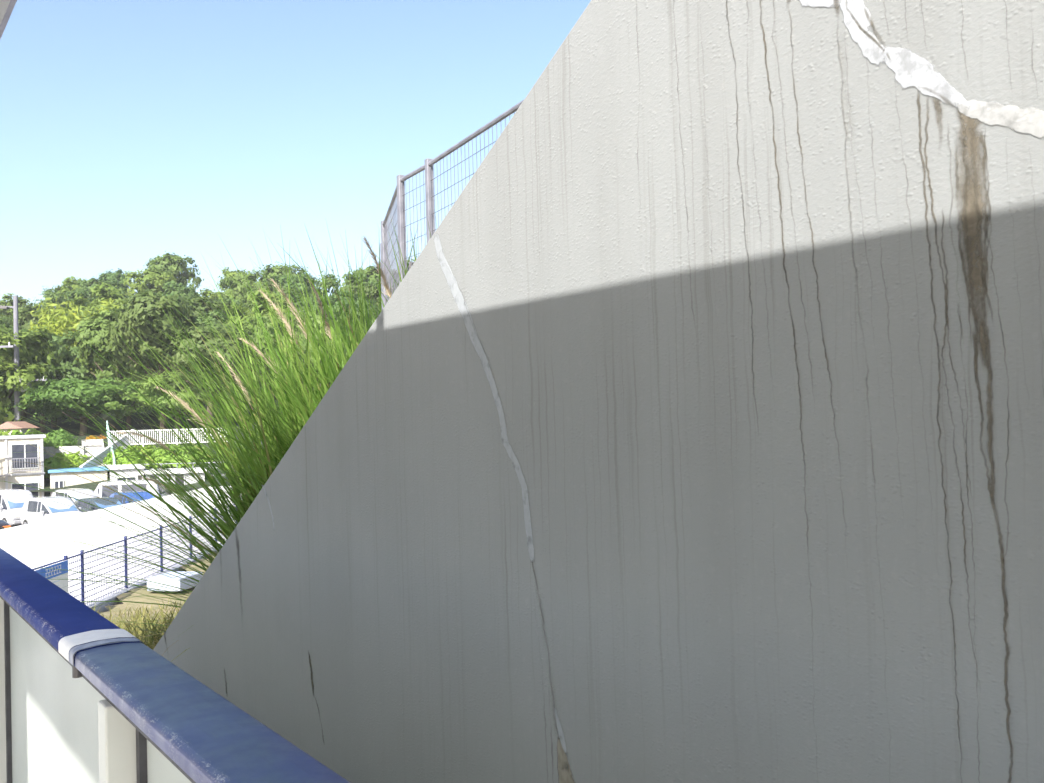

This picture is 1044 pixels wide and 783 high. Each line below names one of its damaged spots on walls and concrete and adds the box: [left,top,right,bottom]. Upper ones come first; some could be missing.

crack [434,234,534,562]
water stain [761,25,771,102]
water stain [773,125,789,289]
crack [799,0,1044,138]
rust [917,95,956,440]
rust [959,112,1013,783]